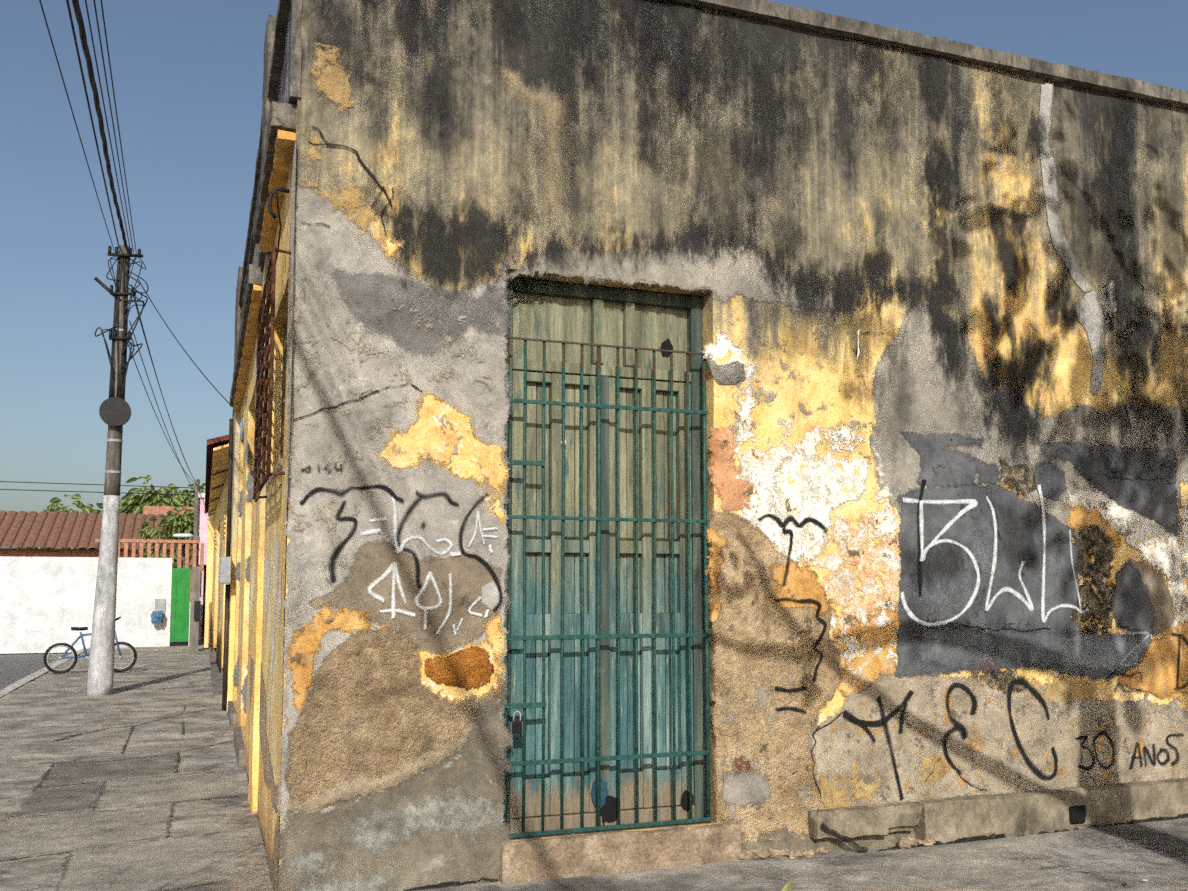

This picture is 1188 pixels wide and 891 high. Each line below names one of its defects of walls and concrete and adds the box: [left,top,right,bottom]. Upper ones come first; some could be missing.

water stain [310,43,353,111]
water stain [575,0,709,163]
crack [308,125,394,235]
crack [292,383,422,421]
water stain [301,179,734,292]
water stain [748,52,965,381]
water stain [990,207,1031,296]
water stain [979,296,1055,446]
water stain [1046,280,1083,329]
water stain [1099,99,1172,341]
peeling [232,140,857,890]
peeling [705,302,1188,843]